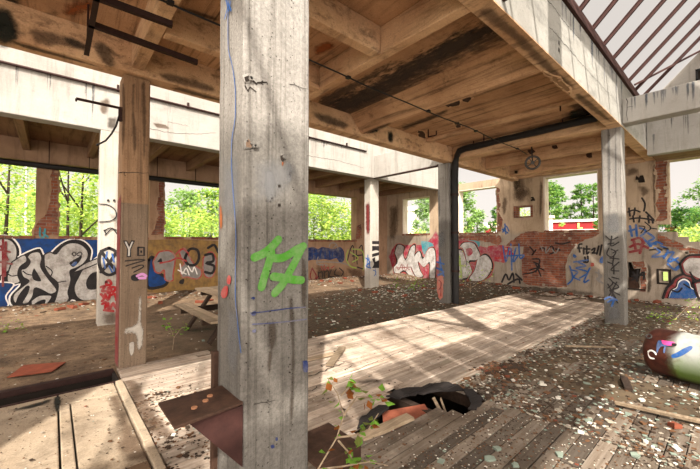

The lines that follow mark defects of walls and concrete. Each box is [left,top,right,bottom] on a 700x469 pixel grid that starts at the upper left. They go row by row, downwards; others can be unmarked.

water stain [0,0,92,65]
water stain [96,43,113,65]
water stain [162,74,219,100]
water stain [316,9,570,127]
water stain [571,94,608,119]
flaking render [31,169,61,238]
flaking render [150,182,166,237]
flaking render [458,186,601,289]
flaking render [633,160,670,223]
flaking render [631,259,649,293]